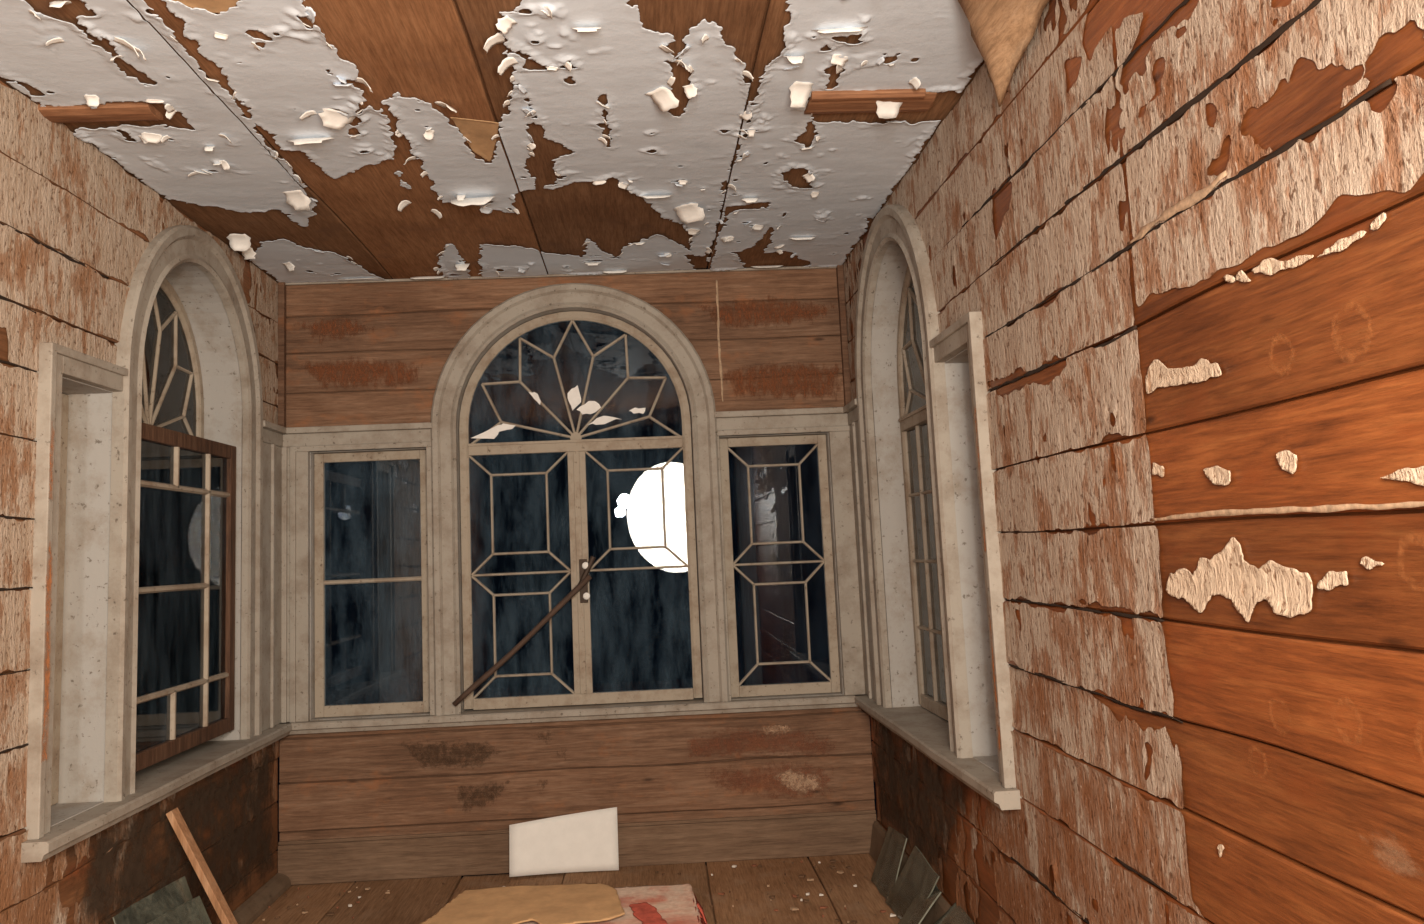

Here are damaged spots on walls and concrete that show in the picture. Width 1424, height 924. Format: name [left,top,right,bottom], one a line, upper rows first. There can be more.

peeling [0,0,1424,622]
peeling [0,590,31,835]
peeling [1003,602,1184,809]
peeling [0,830,69,924]
peeling [71,837,90,869]
peeling [73,898,99,924]
peeling [96,812,139,910]
peeling [781,771,818,790]
peeling [955,731,1208,924]